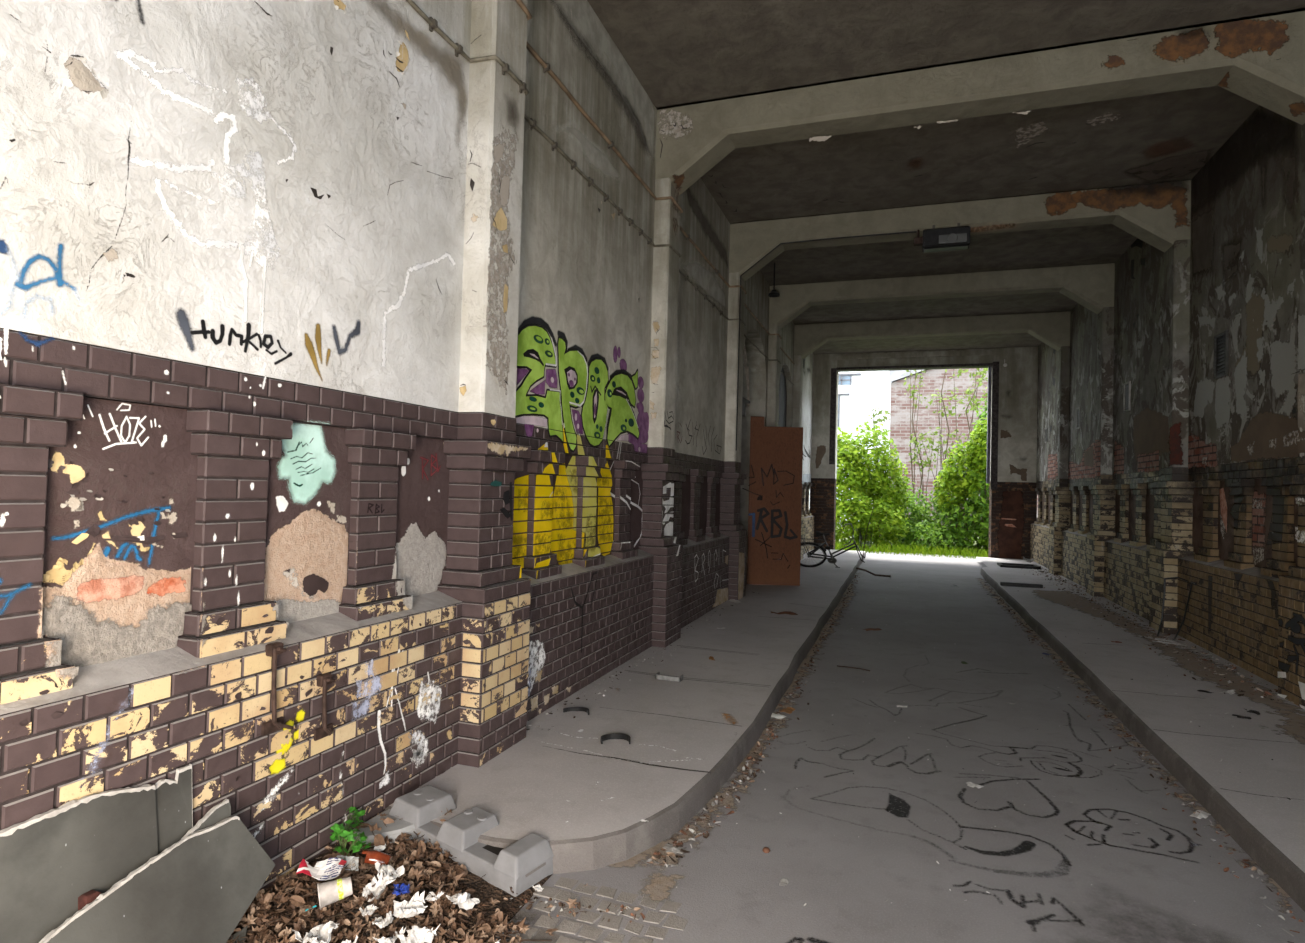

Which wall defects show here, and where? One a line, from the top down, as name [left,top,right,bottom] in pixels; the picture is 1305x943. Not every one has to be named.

peeling [466,128,518,395]
spalling [1047,439,1113,480]
peeling [1168,227,1305,469]
spalling [0,452,571,943]